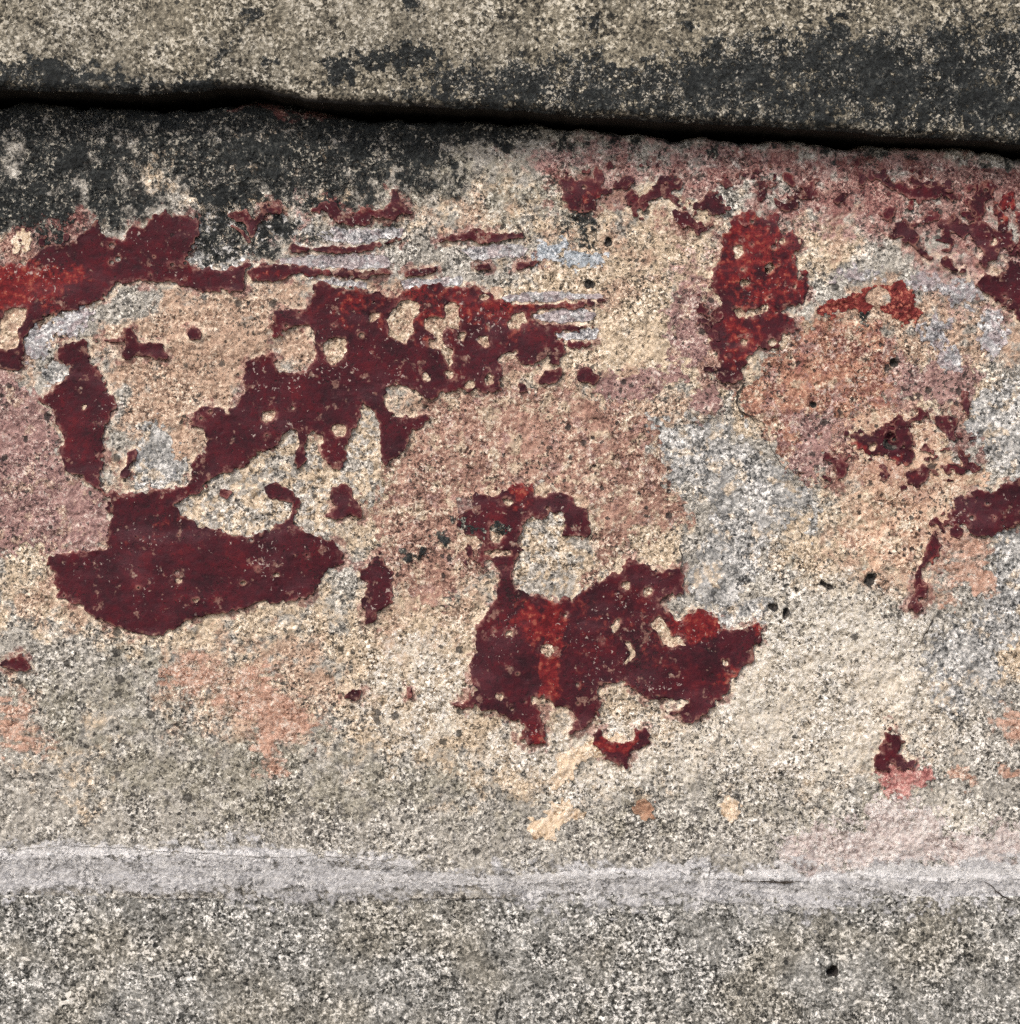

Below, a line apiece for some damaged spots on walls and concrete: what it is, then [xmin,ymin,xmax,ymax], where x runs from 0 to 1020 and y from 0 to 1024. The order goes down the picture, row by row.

leakage [237,7,265,26]
leakage [0,40,463,289]
leakage [502,291,603,340]
peeling [555,160,820,384]
peeling [833,158,1020,321]
peeling [0,189,606,636]
peeling [453,368,1020,772]
peeling [0,653,32,672]
peeling [344,689,362,701]